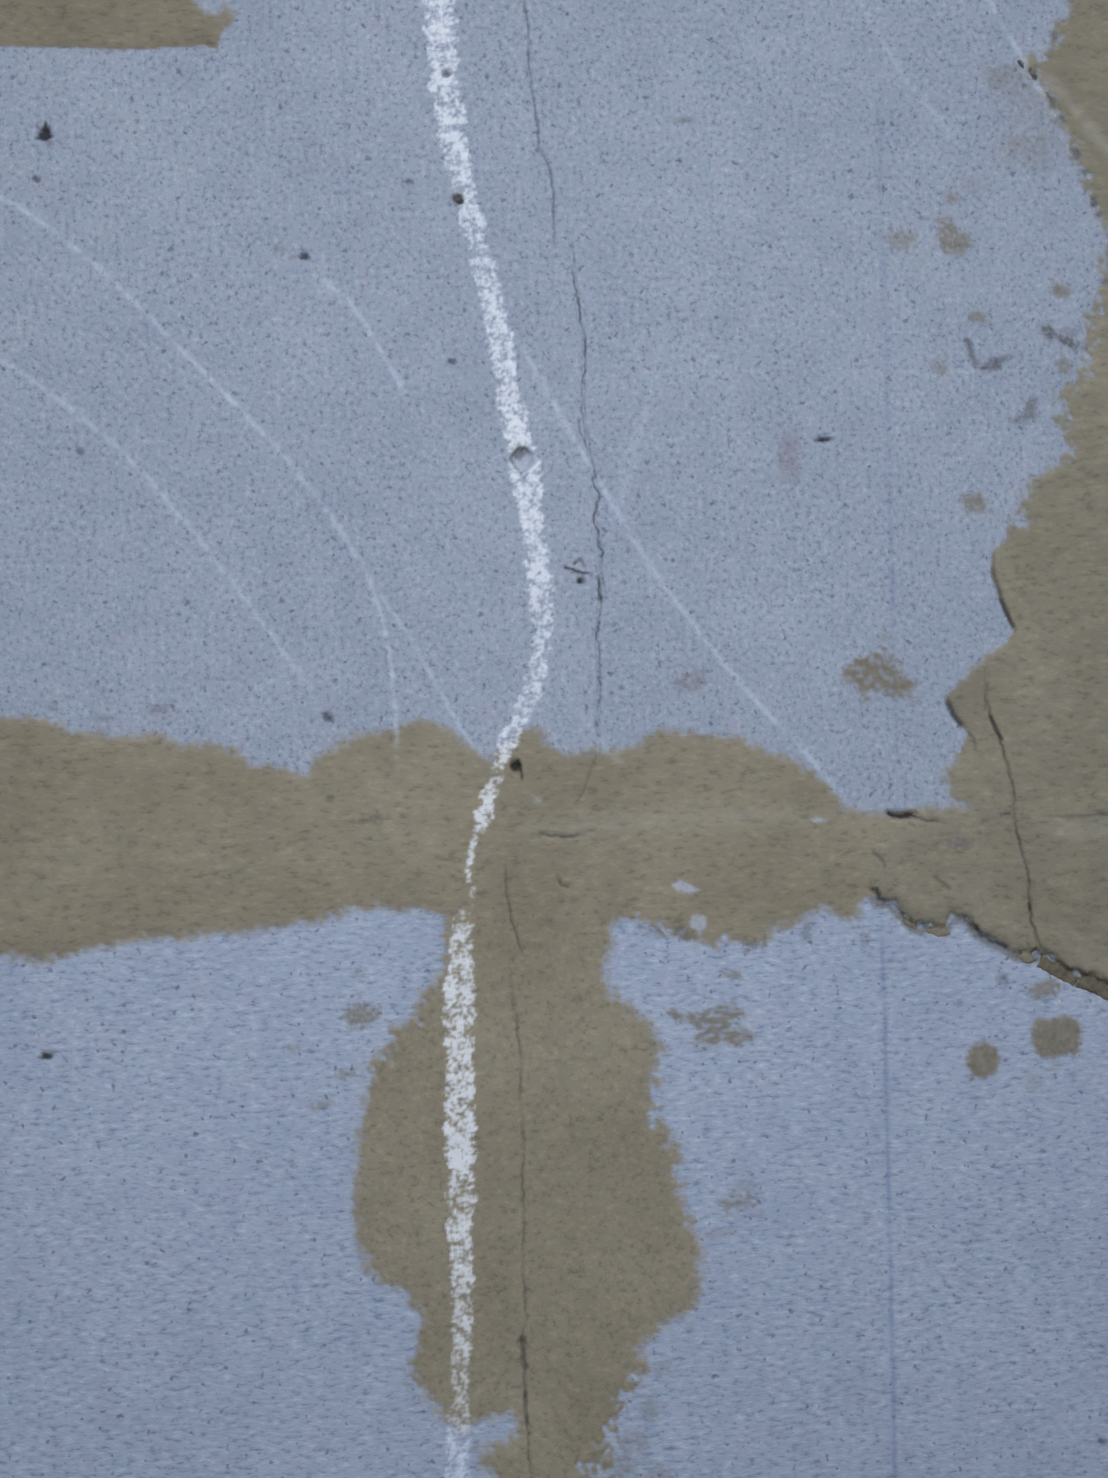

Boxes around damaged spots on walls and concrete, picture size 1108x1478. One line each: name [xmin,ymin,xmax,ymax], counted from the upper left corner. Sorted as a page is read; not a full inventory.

peeling [1027,0,1108,224]
crack [946,703,960,724]
peeling [870,252,1108,1001]